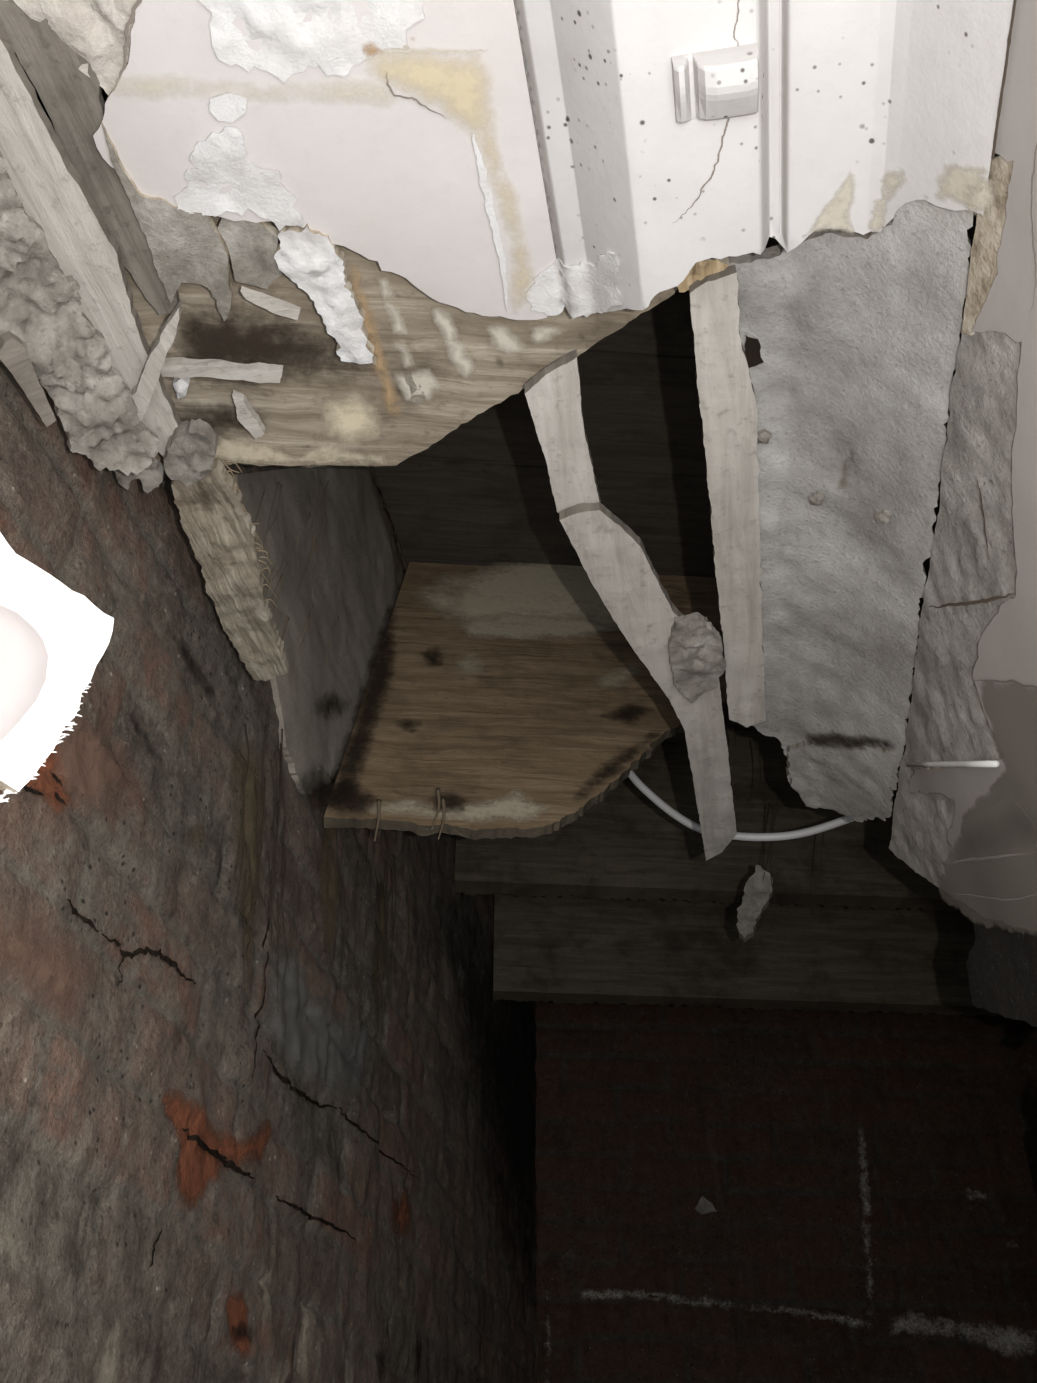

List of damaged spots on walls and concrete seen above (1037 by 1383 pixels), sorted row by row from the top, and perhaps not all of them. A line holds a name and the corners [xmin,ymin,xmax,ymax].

flaking render [13,0,142,95]
peeling [198,0,425,83]
crack [732,0,740,46]
crack [991,0,1017,160]
peeling [174,92,303,231]
leakage [361,48,528,313]
flaking render [526,250,622,318]
crack [672,118,730,223]
crack [1029,145,1037,314]
crack [66,899,196,987]
crack [245,872,421,1181]
crack [182,1128,357,1243]